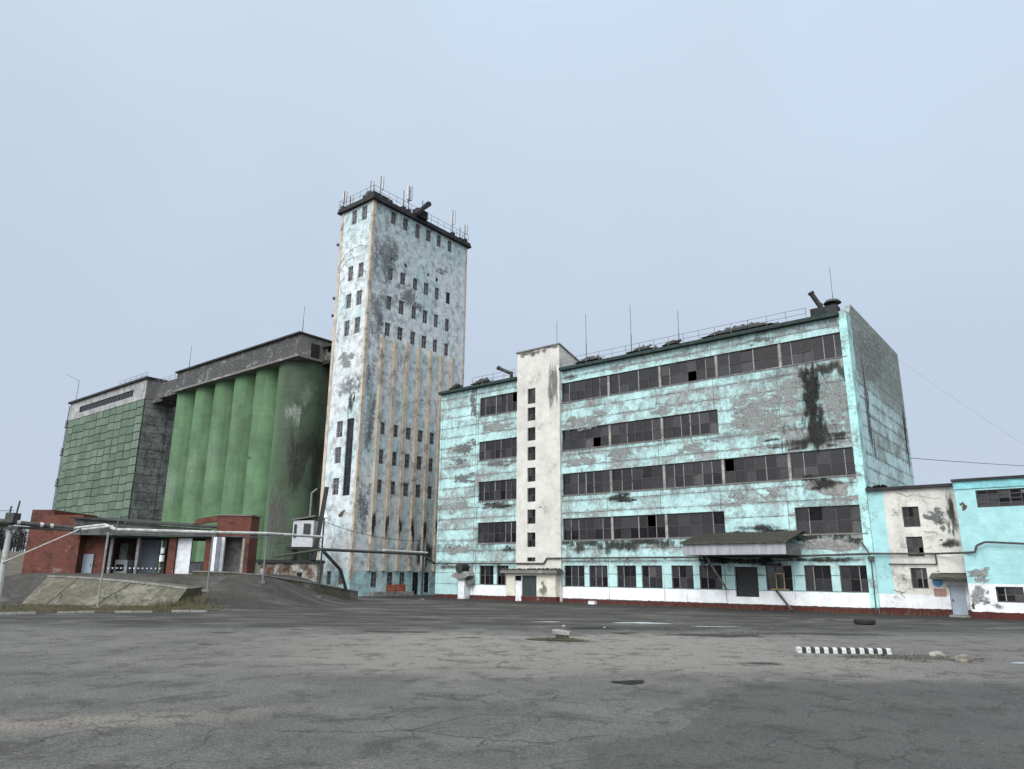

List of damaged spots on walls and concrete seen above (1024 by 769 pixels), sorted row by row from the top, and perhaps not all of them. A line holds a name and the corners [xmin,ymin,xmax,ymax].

peeling [338,352,354,368]
damp [548,370,577,404]
peeling [729,373,801,438]
damp [764,361,846,453]
damp [287,426,325,507]
peeling [923,507,946,532]
flaking render [967,567,991,609]